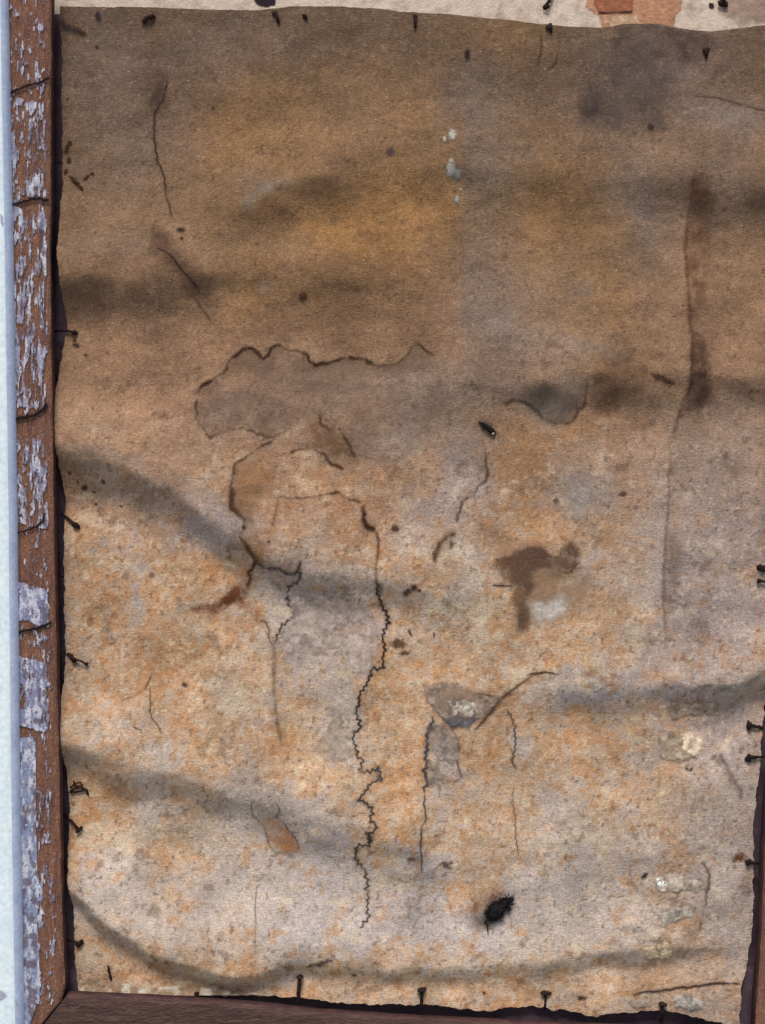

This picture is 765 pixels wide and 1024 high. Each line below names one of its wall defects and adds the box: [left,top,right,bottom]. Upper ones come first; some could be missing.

crack [153,82,172,216]
crack [156,247,209,318]
rust [195,586,244,613]
water stain [500,544,591,630]
peeling [422,682,501,729]
crack [352,583,391,928]
crack [420,671,555,873]